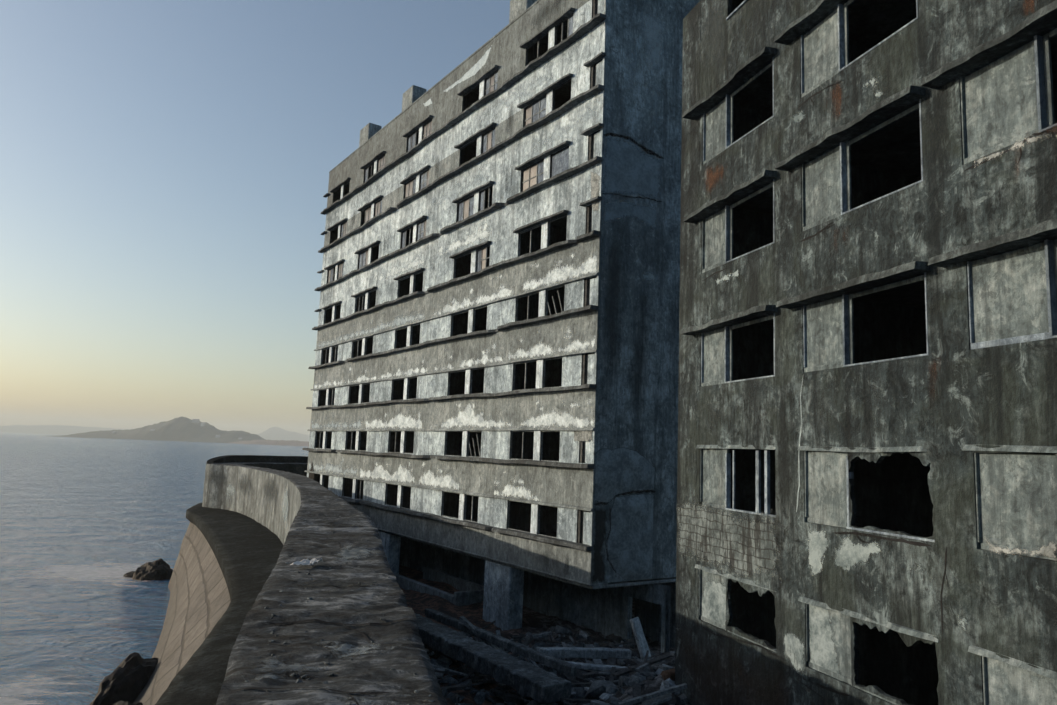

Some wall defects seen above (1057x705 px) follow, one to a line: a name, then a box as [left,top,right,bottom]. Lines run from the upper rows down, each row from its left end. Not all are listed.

crack [603,132,664,159]
spalling [974,133,1057,165]
crack [594,490,655,573]
peeling [808,452,934,575]